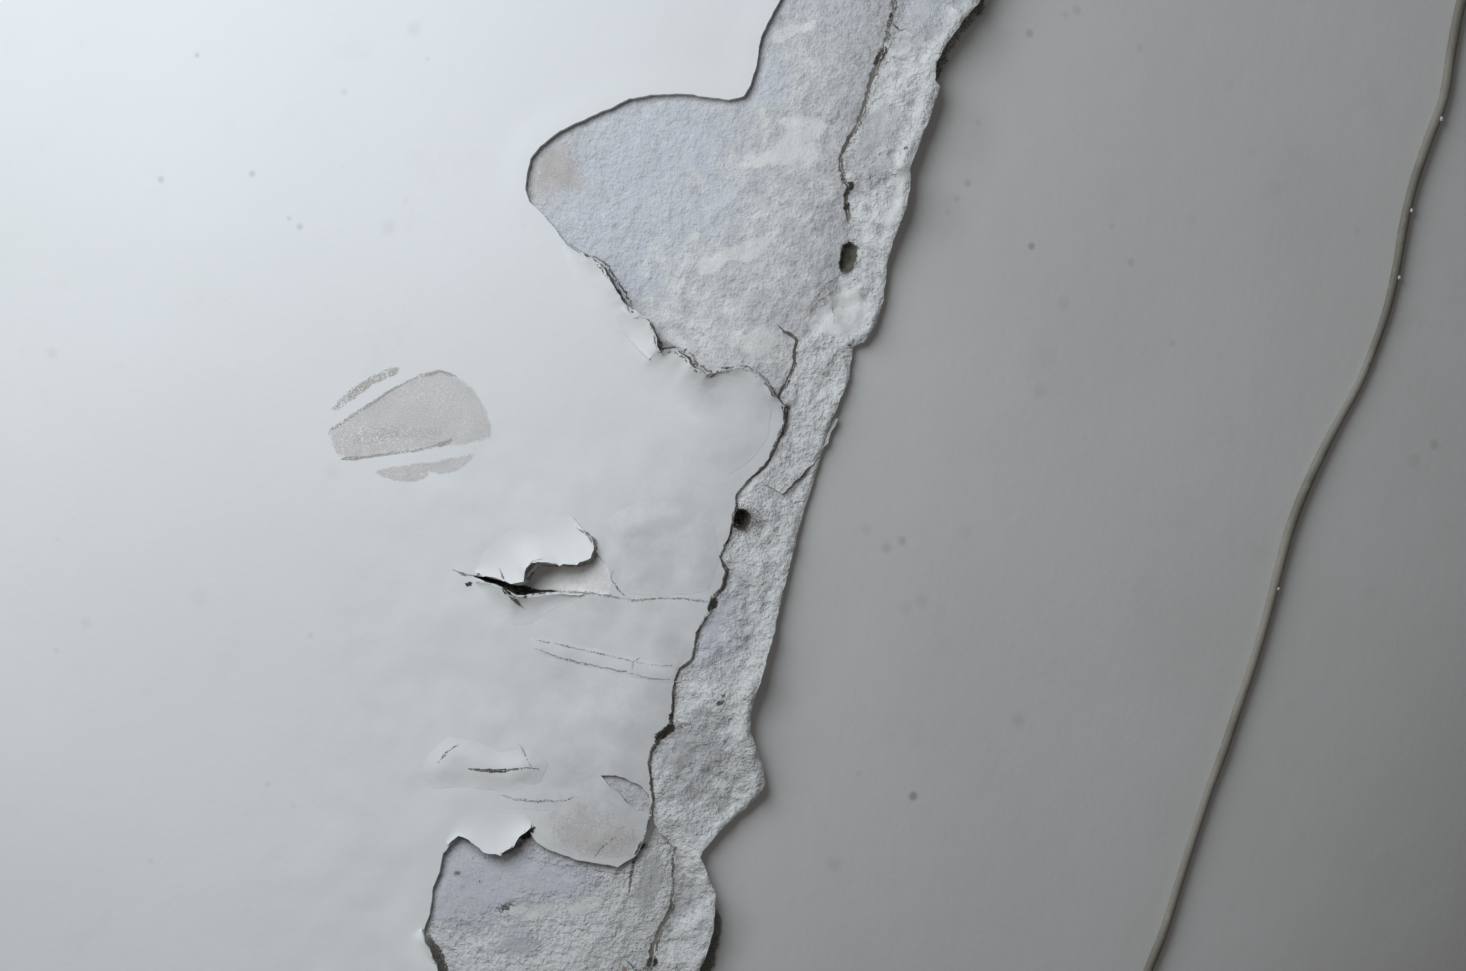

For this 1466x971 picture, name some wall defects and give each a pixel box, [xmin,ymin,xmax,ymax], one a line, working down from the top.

damp [328,367,491,482]
spalling [403,0,980,971]
crack [579,278,835,971]
crack [838,0,908,224]